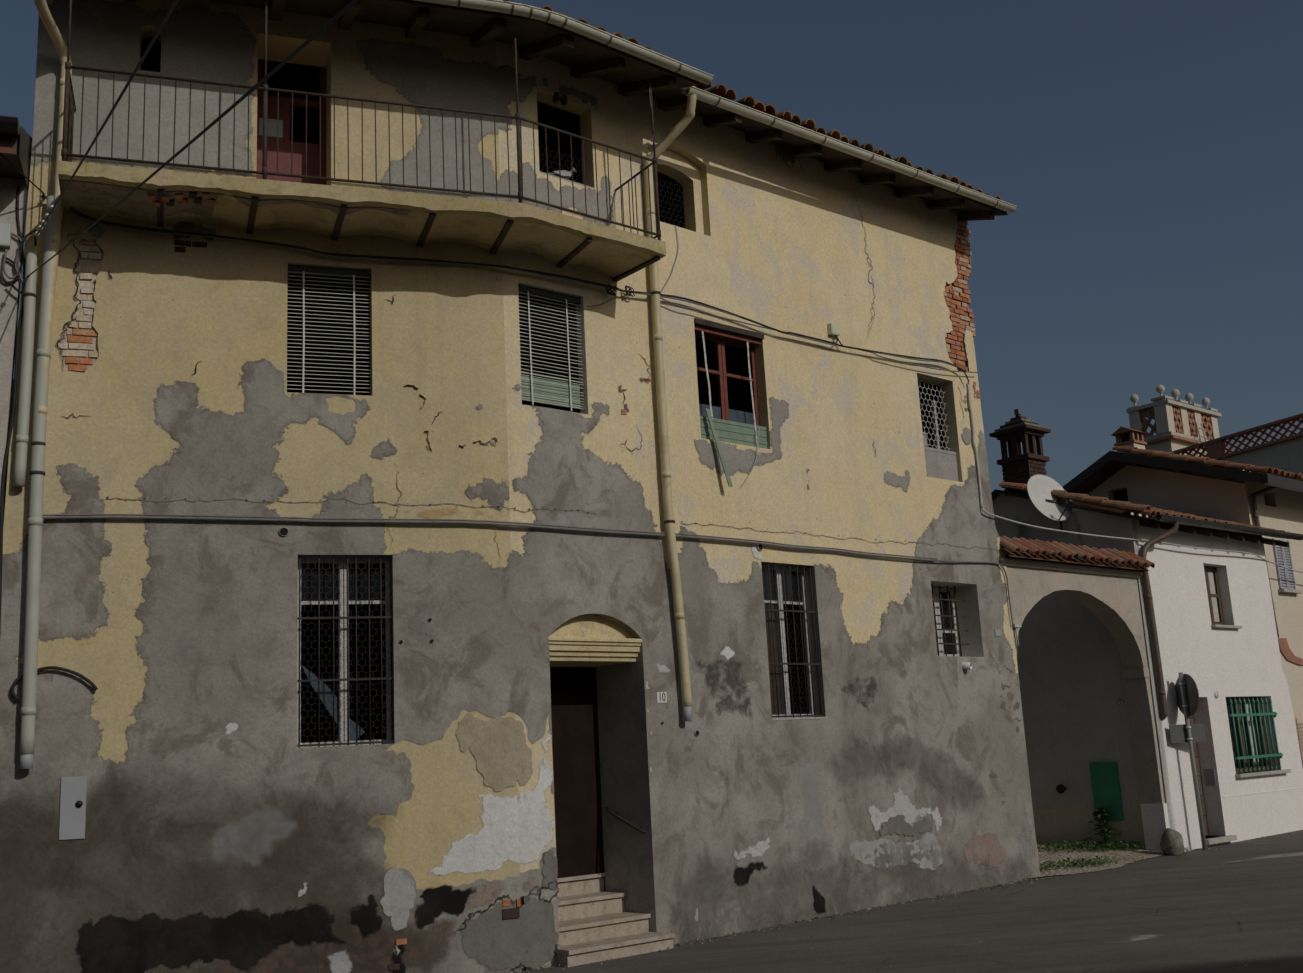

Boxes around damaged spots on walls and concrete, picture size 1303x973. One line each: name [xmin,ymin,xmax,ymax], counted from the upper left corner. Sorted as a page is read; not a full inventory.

peeling [31,0,256,176]
spalling [59,179,410,253]
peeling [356,38,613,226]
crack [855,184,875,331]
peeling [0,221,1040,973]
damp [0,782,537,973]